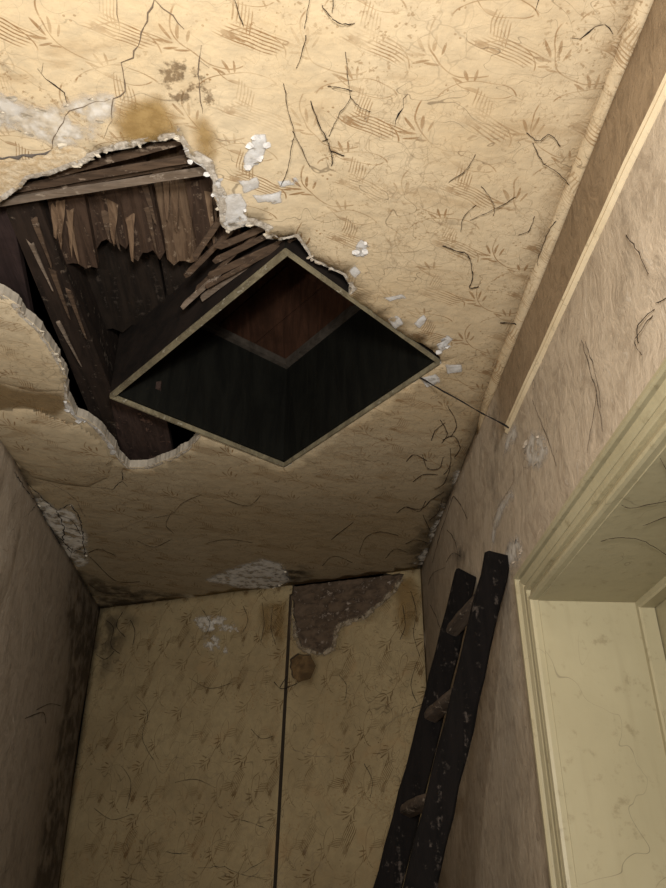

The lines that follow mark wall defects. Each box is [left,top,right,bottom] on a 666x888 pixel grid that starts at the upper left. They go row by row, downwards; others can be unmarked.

crack [0,0,184,160]
crack [197,45,208,113]
damp [118,101,174,141]
damp [198,123,212,154]
peeling [0,93,368,295]
flaking render [0,293,117,455]
peeling [421,364,462,387]
peeling [436,336,452,355]
crack [581,340,602,451]
peeling [37,498,88,567]
flaking render [207,559,403,682]